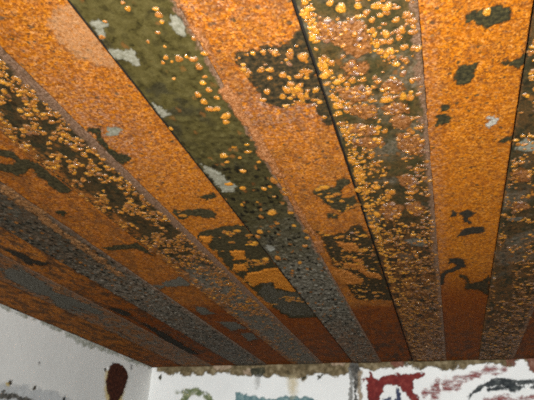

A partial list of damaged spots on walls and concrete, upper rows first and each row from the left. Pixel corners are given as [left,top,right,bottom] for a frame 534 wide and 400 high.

rust [0,50,350,390]
rust [234,0,534,373]